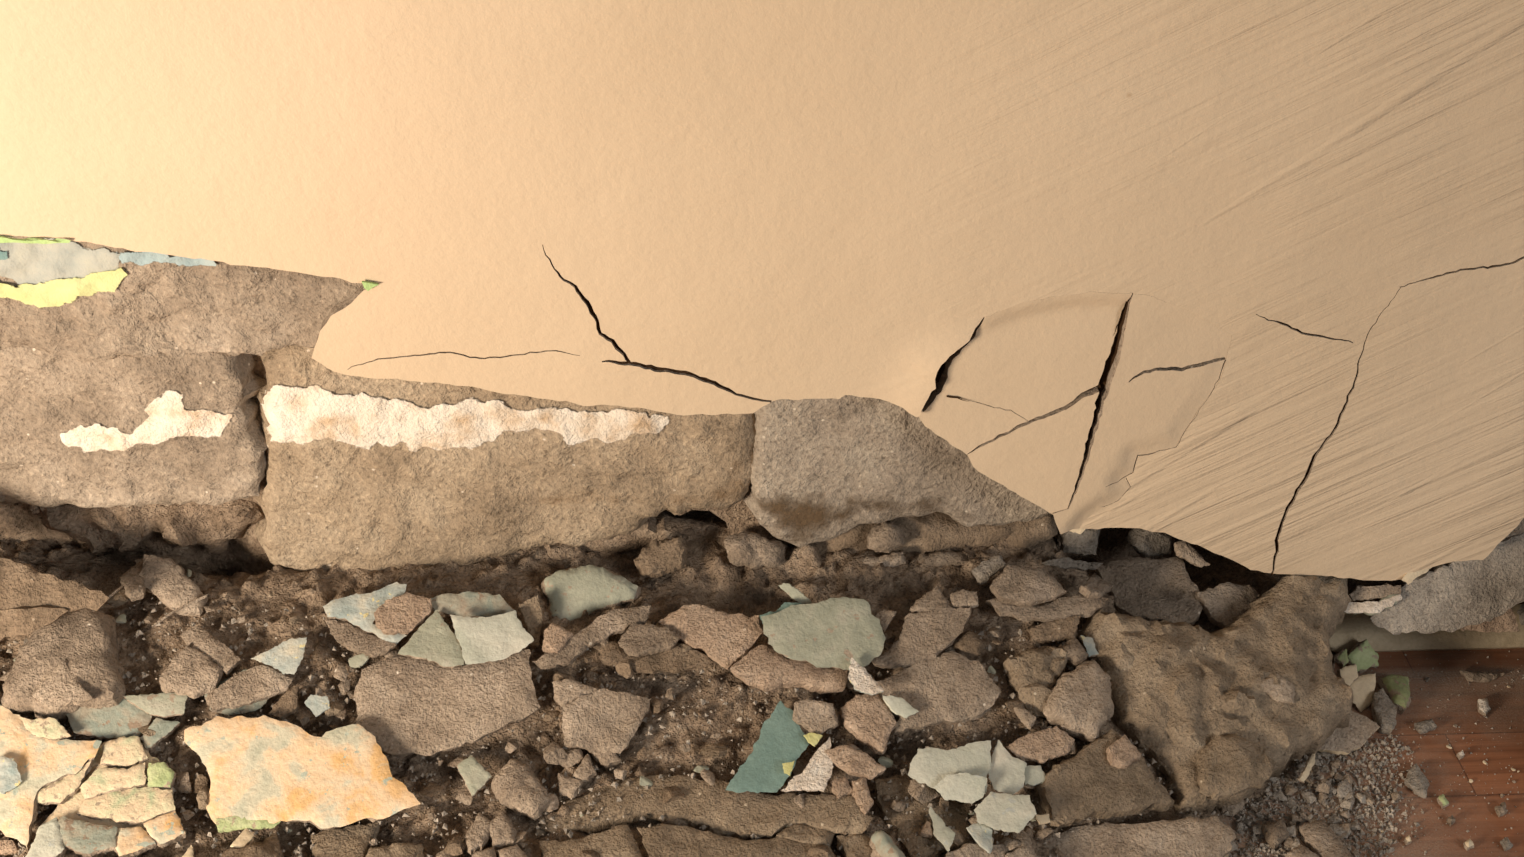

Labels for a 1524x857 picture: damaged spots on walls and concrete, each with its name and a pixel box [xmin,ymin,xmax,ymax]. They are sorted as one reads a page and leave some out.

crack [1419,256,1524,281]
crack [543,247,771,401]
crack [935,362,979,403]
crack [1079,298,1130,472]
flaking render [0,236,1209,576]
crack [1261,316,1378,575]
flaking render [1347,563,1447,598]
peeling [760,583,812,623]
peeling [204,638,307,716]
peeling [348,653,369,668]
peeling [1079,635,1099,658]
peeling [304,694,330,717]